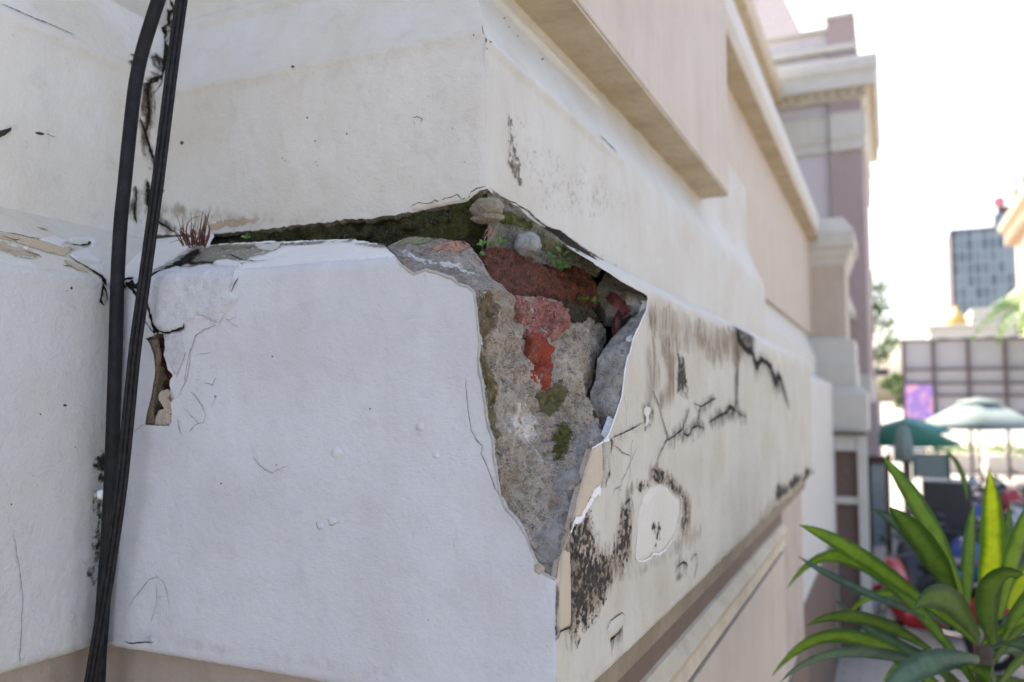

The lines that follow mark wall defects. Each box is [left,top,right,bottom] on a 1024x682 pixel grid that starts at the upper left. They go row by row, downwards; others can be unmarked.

mould [508,117,522,186]
peeling [0,227,104,272]
crack [176,353,215,436]
spalling [146,186,648,639]
water stain [650,312,688,406]
crack [614,317,791,489]
mould [566,469,690,648]